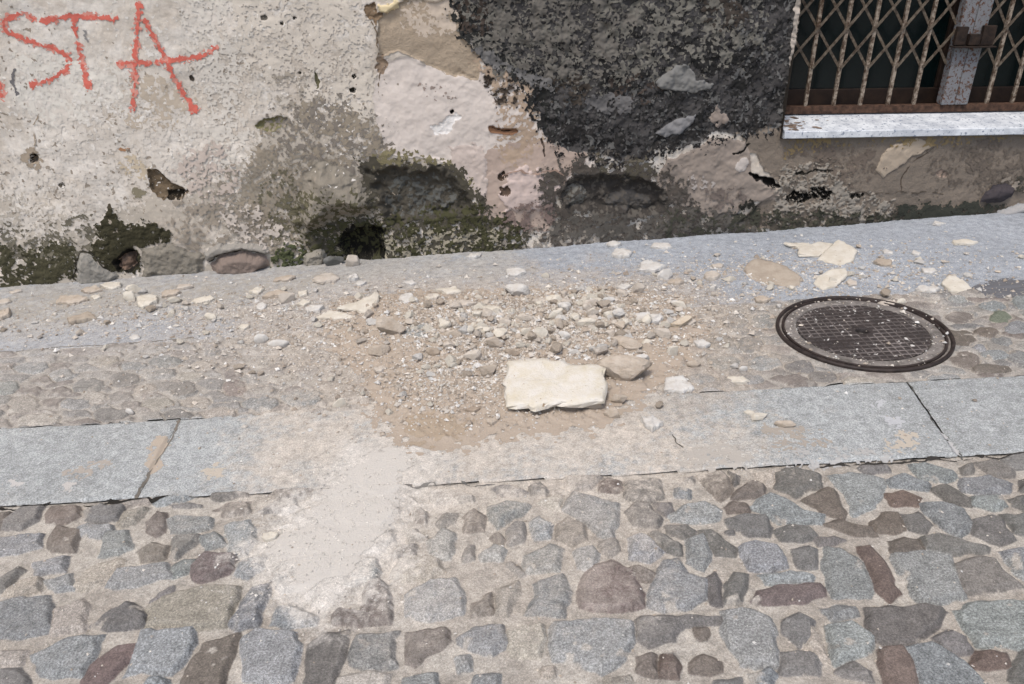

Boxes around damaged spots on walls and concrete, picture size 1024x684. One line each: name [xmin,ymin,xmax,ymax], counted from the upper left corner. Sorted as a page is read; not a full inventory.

peeling [0,0,1024,284]
damp [0,0,1024,285]
crack [135,419,181,500]
crack [907,382,963,460]